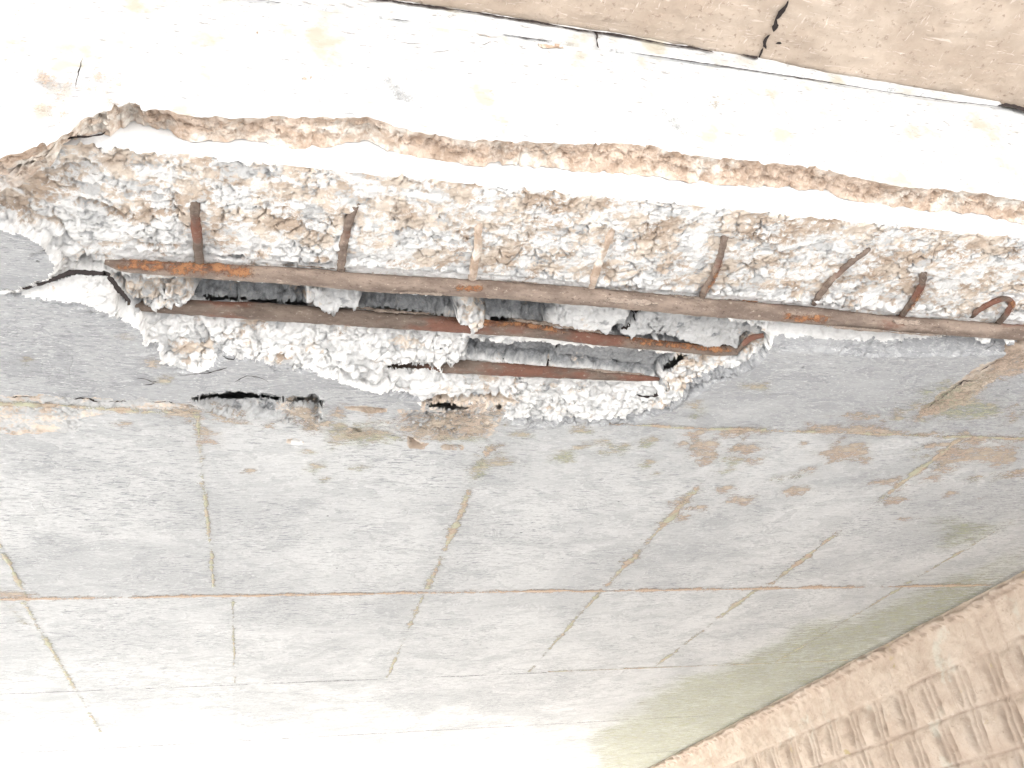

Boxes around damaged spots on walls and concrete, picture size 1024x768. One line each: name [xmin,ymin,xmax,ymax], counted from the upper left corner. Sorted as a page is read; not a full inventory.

crack [631,1,999,107]
crack [4,270,131,303]
spalling [0,69,1024,450]